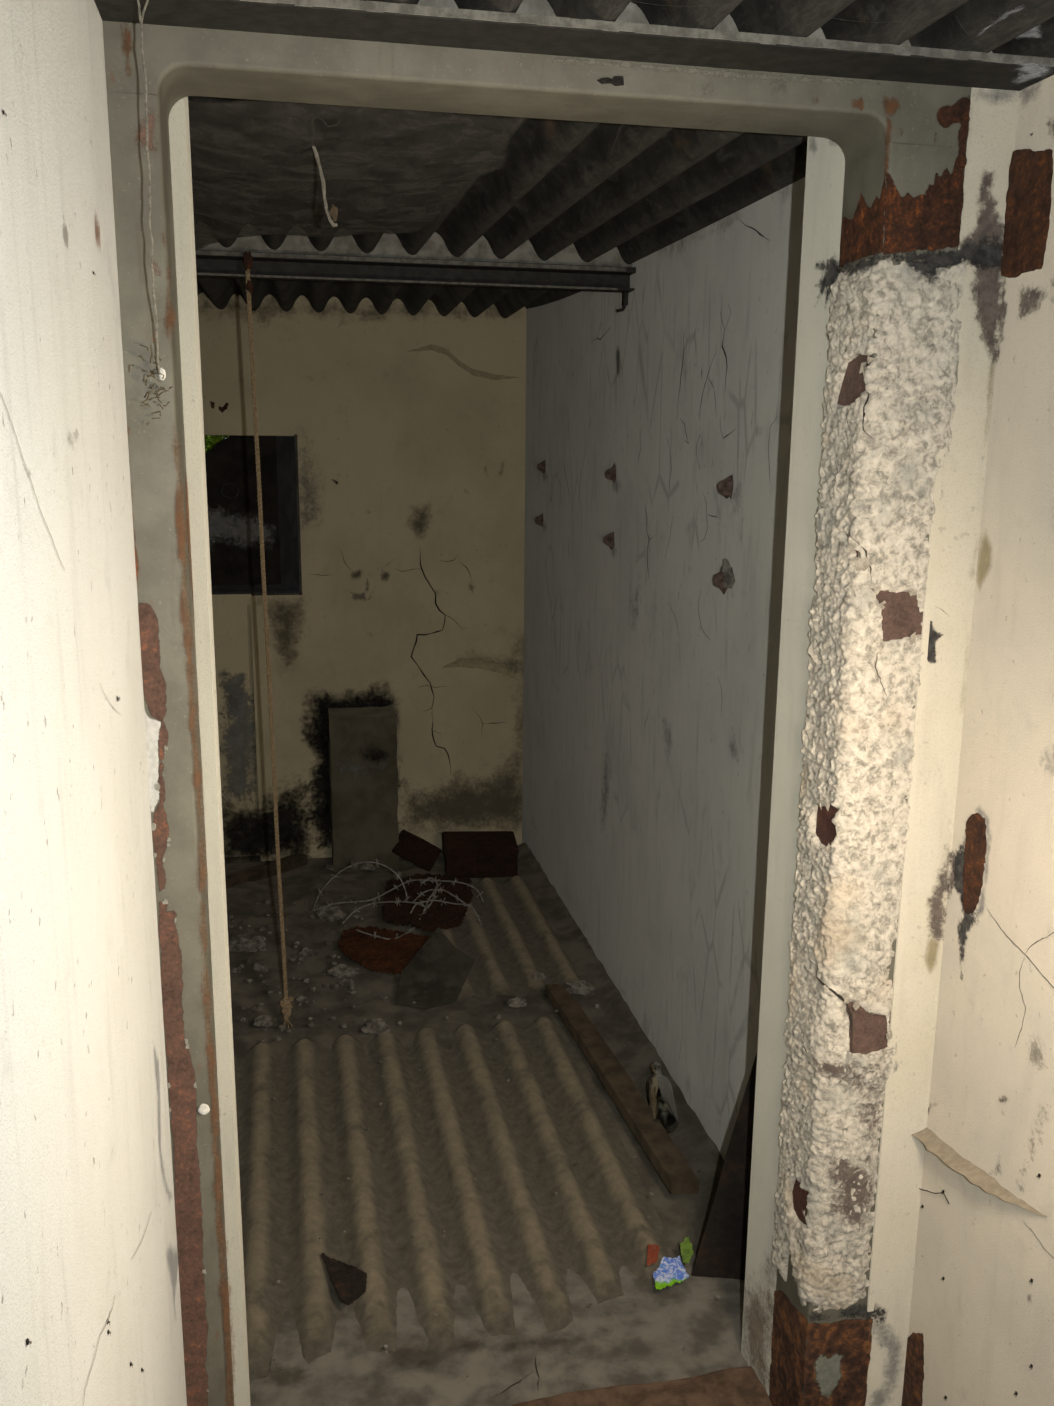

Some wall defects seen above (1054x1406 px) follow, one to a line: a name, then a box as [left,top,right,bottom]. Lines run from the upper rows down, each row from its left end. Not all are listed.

corrosion [839,97,970,268]
spalling [829,354,875,410]
corrosion [175,479,203,803]
crack [383,552,472,771]
spalling [870,585,923,645]
corrosion [199,836,208,887]
spalling [816,801,839,853]
spalling [842,994,892,1057]
crack [987,909,1054,1046]
corrosion [204,971,234,1406]
spalling [786,1179,809,1230]
corrosion [769,1291,873,1406]